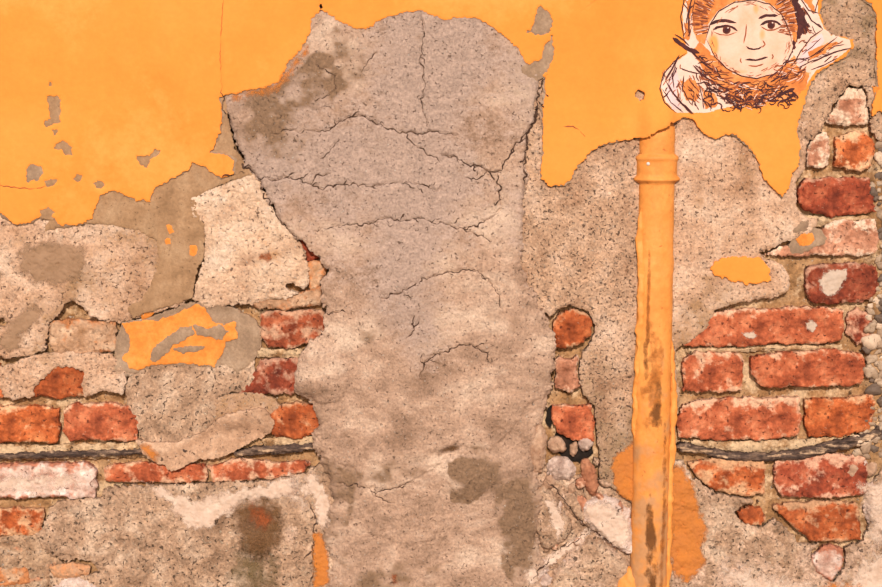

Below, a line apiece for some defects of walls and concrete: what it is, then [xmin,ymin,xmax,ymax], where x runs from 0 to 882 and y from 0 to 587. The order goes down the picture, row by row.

peeling [26,164,57,187]
peeling [44,82,73,155]
peeling [137,150,160,168]
crack [219,1,549,242]
spalling [0,174,335,587]
crack [382,269,501,337]
crack [419,343,489,377]
spalling [520,6,640,587]
spalling [669,0,882,587]
damp [141,472,331,587]